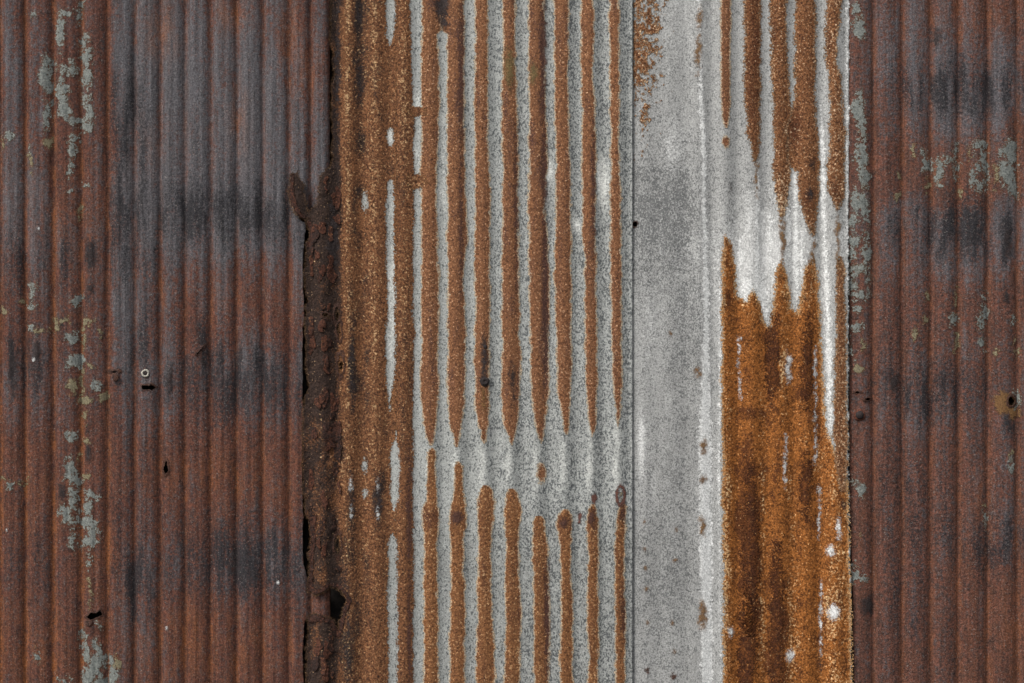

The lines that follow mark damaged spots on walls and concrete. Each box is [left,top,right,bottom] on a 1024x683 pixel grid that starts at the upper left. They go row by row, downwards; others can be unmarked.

peeling [26,0,96,194]
peeling [18,282,122,683]
rust [286,0,674,683]
rust [719,0,854,683]
peeling [848,89,873,373]
peeling [909,137,1020,202]
rust [994,390,1021,420]